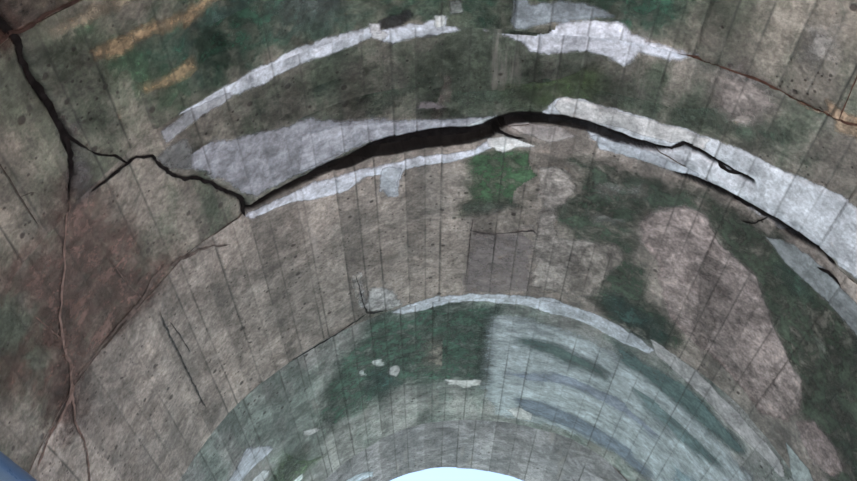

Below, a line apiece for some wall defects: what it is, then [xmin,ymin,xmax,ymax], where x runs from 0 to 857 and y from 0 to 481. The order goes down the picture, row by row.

corrosion [94,0,207,57]
corrosion [144,61,196,90]
spalling [370,10,412,34]
peeling [299,87,490,171]
crack [258,111,753,200]
peeling [717,65,774,124]
peeling [807,32,833,60]
corrosion [816,100,857,137]
crack [0,0,245,481]
crack [465,220,537,279]
peeling [532,166,623,299]
crack [287,276,383,365]